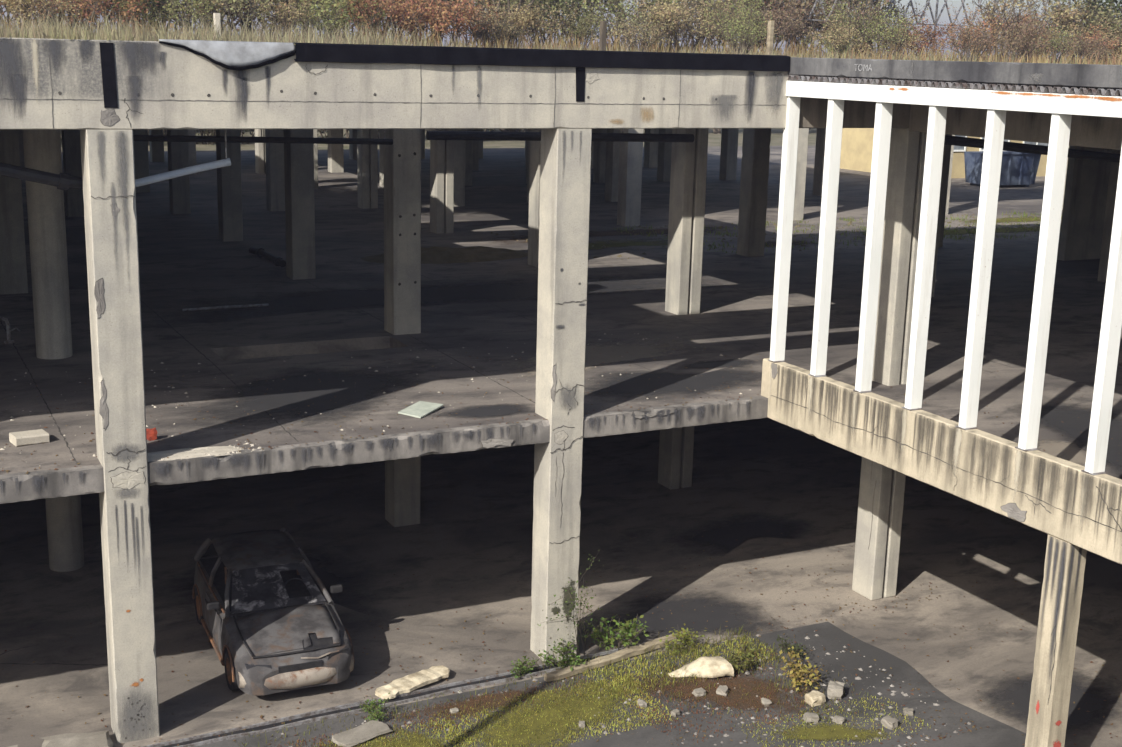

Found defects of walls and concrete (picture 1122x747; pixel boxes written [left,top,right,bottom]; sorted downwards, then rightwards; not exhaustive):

water stain [0,38,61,109]
water stain [121,41,166,113]
water stain [223,69,247,109]
rust [992,91,1122,101]
crack [107,448,146,472]
water stain [202,369,412,423]
water stain [366,404,535,449]
crack [550,379,583,544]
crack [771,395,1122,532]
water stain [777,367,1122,529]
water stain [115,489,143,566]
spalling [1001,503,1027,522]